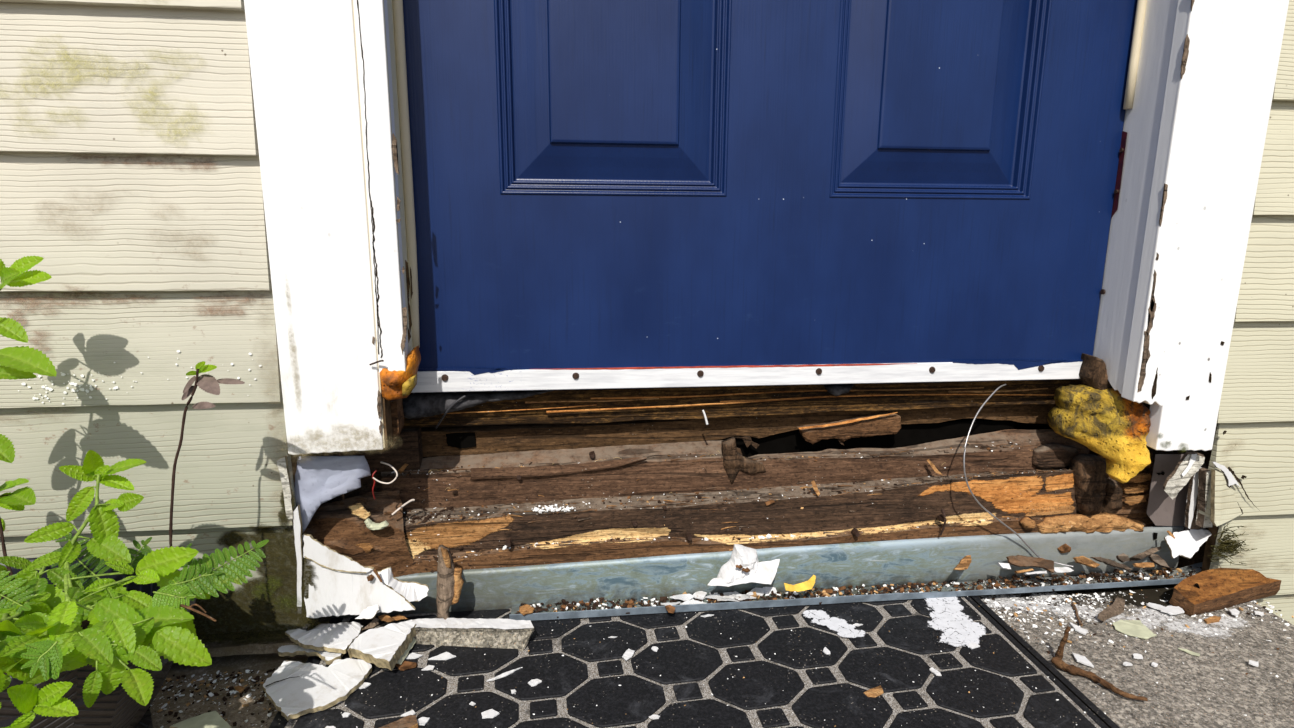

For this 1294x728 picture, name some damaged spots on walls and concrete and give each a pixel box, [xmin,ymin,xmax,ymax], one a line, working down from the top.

peeling [1180,34,1190,79]
peeling [1159,184,1168,227]
peeling [1137,252,1159,410]
spalling [1146,423,1227,469]
peeling [349,503,371,519]
peeling [919,473,1157,534]
peeling [405,513,514,559]
spalling [1177,527,1209,568]
peeling [355,605,380,619]